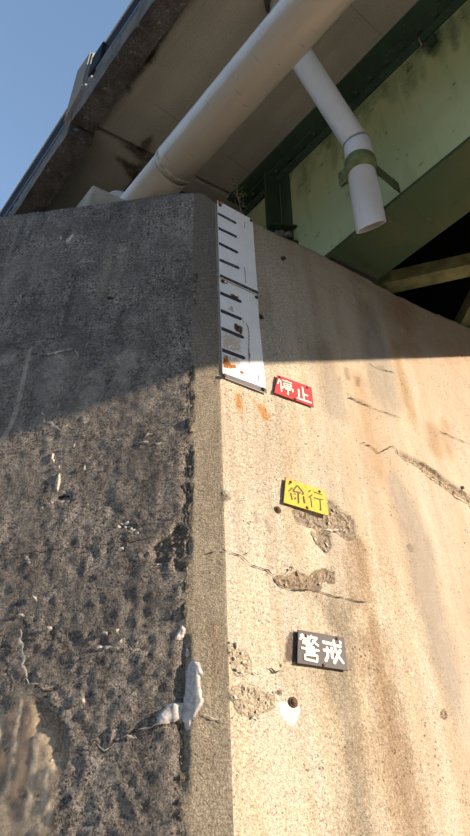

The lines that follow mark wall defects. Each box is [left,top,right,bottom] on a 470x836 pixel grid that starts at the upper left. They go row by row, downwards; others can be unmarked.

spalling [395,451,470,507]
spalling [292,500,354,553]
crack [191,549,365,602]
spalling [274,566,335,592]